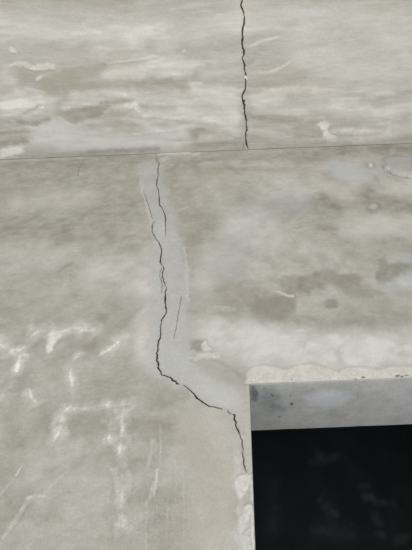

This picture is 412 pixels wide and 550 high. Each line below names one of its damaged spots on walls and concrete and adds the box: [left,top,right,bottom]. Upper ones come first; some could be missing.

crack [227,0,257,151]
damp [0,310,187,550]
crack [143,153,247,473]